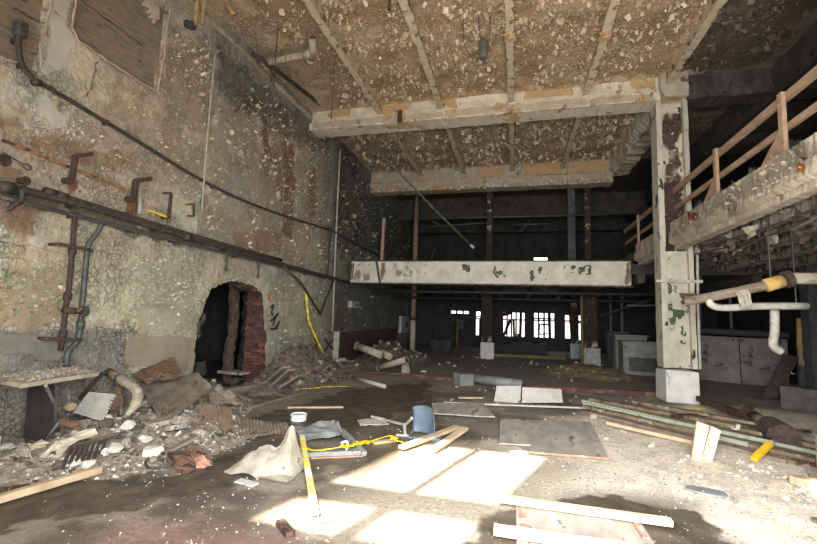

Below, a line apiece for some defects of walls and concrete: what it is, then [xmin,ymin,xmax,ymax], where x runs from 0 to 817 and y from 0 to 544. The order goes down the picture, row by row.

crack [83,61,99,103]
flaking render [66,0,634,276]
peeling [279,0,707,118]
rust [126,198,143,216]
spalling [125,249,405,389]
peeling [668,284,686,345]